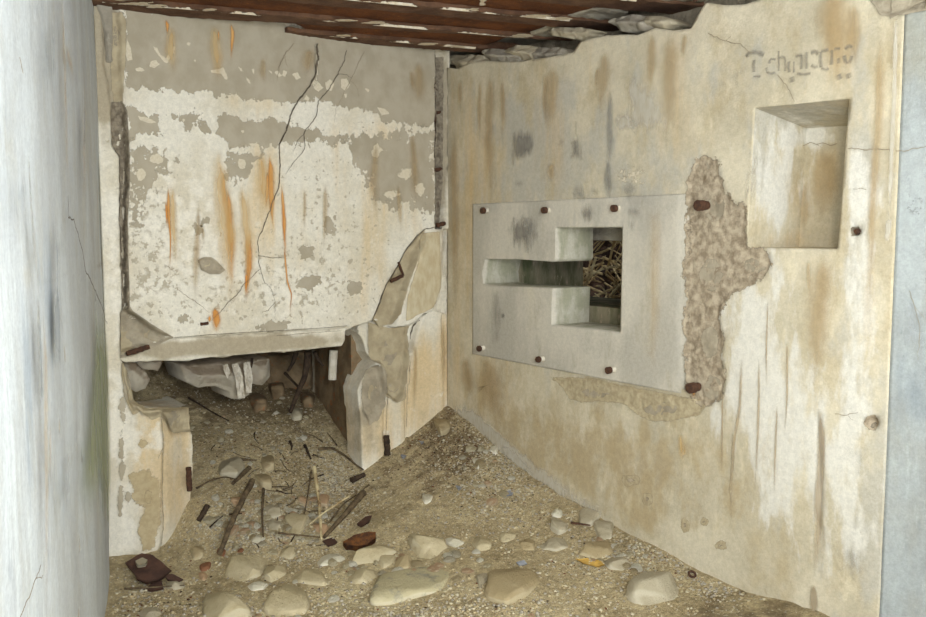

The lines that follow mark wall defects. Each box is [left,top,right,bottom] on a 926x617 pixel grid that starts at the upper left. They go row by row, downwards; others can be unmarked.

peeling [530,8,628,41]
spalling [870,0,926,19]
crack [68,202,107,322]
rust [222,176,234,264]
crack [167,44,364,338]
rust [266,161,286,242]
peeling [110,0,444,551]
spalling [553,155,773,422]
crack [803,142,926,151]
damp [757,309,768,449]
damp [774,354,788,473]
damp [815,418,825,545]